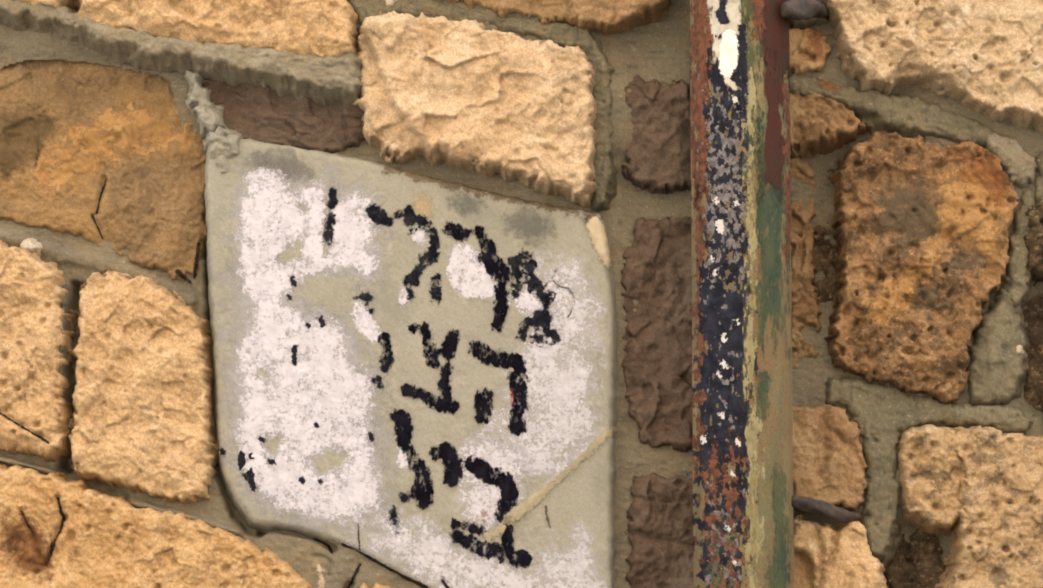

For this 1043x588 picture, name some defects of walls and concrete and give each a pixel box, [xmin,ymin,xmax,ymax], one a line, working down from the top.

corrosion [689,0,749,588]
peeling [690,0,792,588]
corrosion [749,0,766,46]